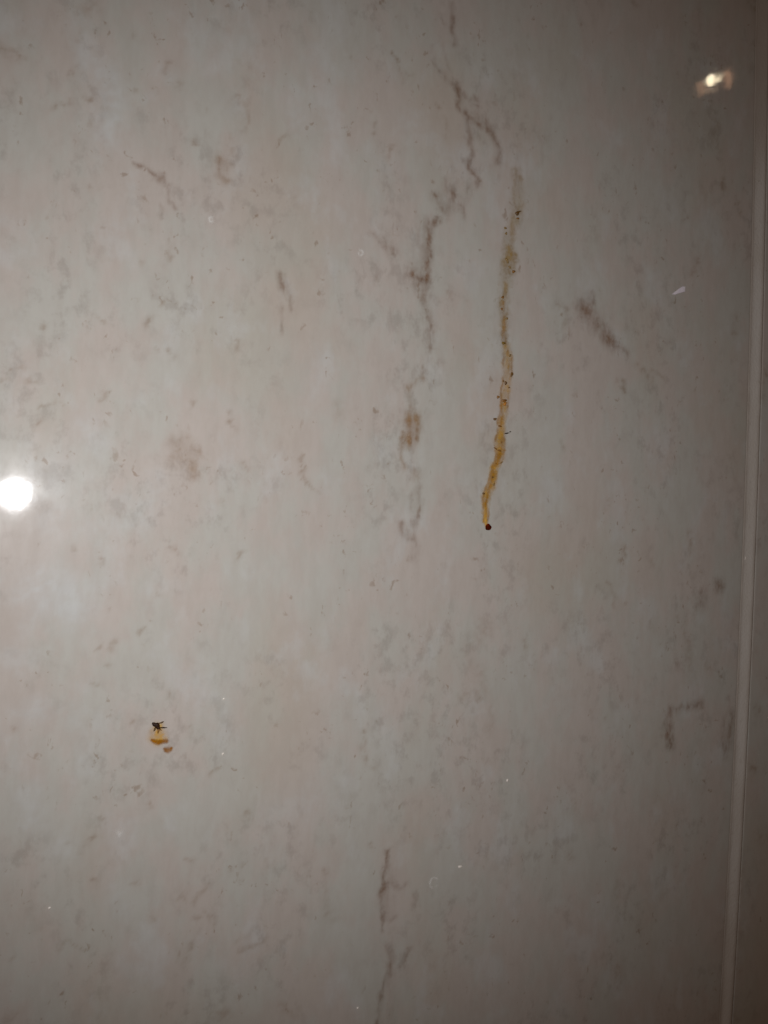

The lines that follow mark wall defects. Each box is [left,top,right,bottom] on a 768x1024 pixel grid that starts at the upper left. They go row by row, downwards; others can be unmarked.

corrosion [482,372,513,530]